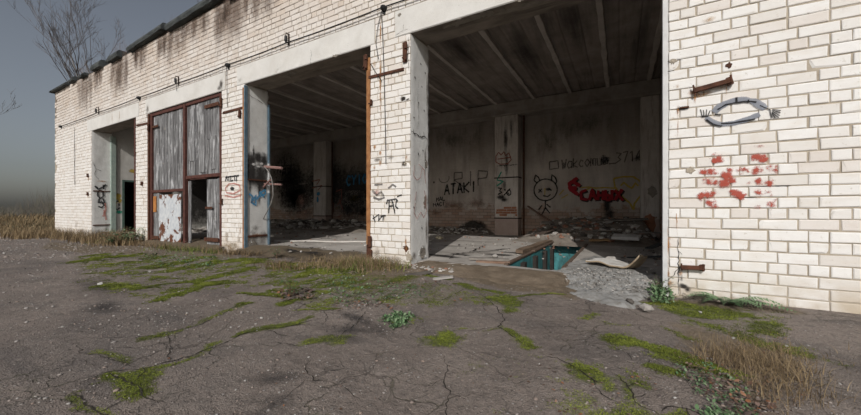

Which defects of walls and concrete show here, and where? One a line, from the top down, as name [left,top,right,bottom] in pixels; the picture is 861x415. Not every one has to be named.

water stain [218,0,255,27]
water stain [249,153,307,207]
crack [71,293,366,415]
crack [434,354,465,415]